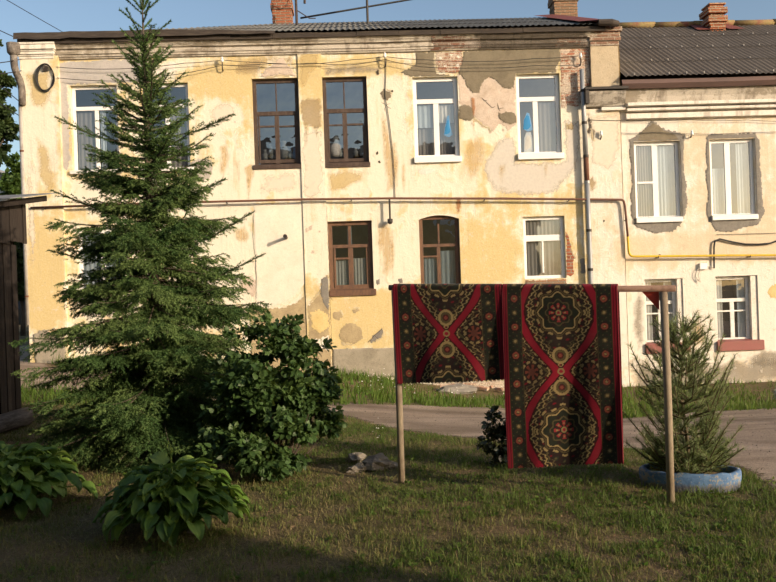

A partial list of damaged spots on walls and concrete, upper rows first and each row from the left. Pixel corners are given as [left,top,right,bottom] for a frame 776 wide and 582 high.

peeling [430,35,517,133]
flaking render [555,35,590,111]
flaking render [525,232,576,284]
peeling [250,275,385,351]
peeling [299,349,332,372]